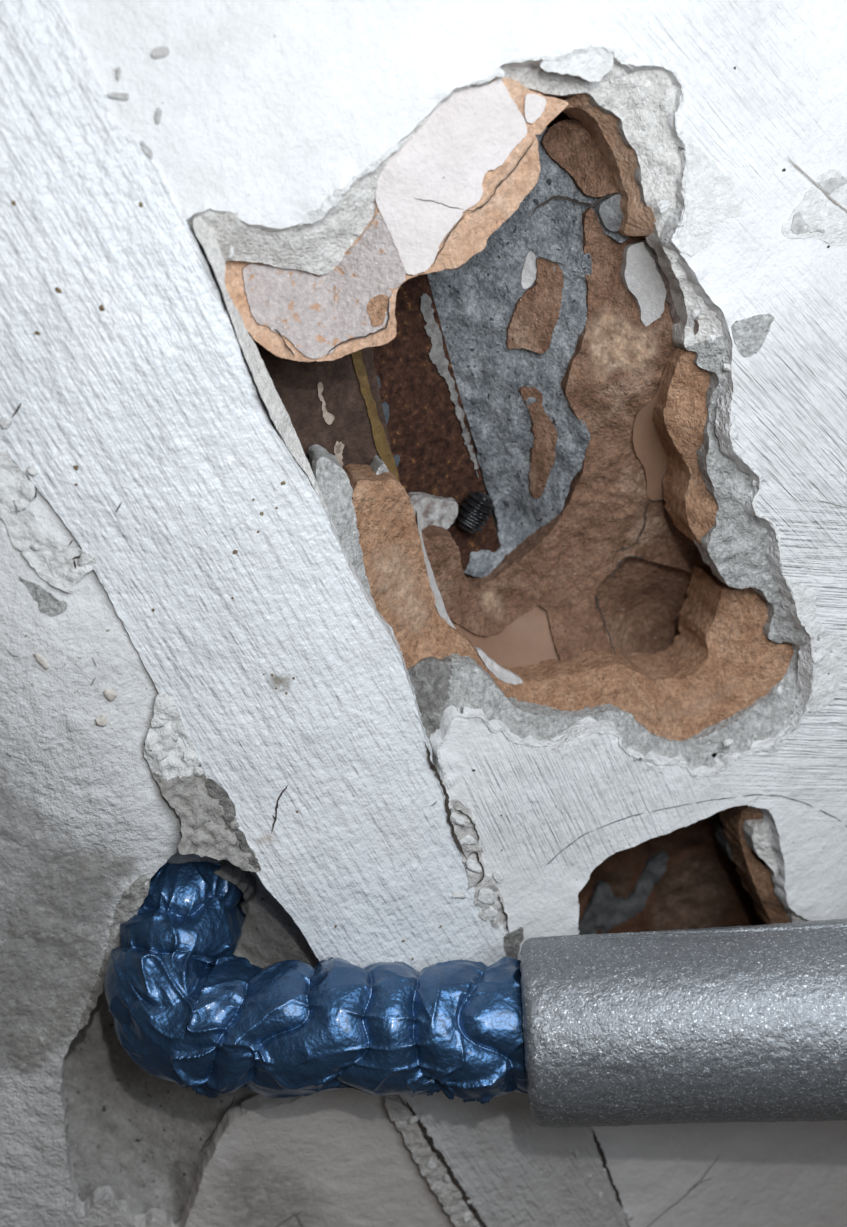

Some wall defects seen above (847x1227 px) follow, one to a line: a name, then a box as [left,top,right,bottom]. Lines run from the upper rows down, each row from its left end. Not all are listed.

flaking render [188,102,442,275]
flaking render [344,44,847,798]
flaking render [143,693,319,968]
crack [424,741,509,933]
spalling [715,805,809,925]
flaking render [63,874,261,1224]
crack [384,1096,487,1227]